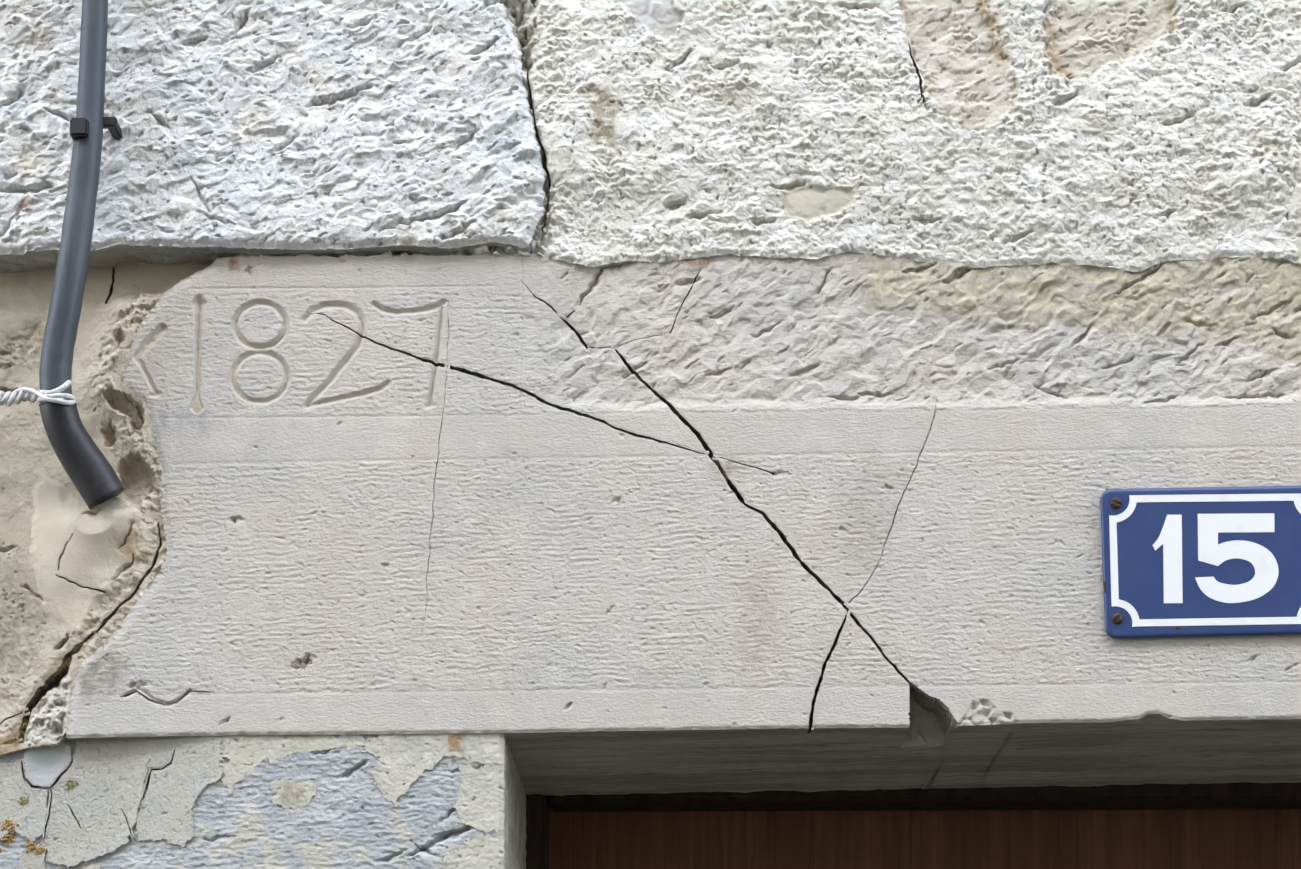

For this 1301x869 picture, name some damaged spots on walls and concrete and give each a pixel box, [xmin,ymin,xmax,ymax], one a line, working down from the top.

peeling [0,270,231,869]
crack [307,268,938,734]
peeling [882,696,1019,790]